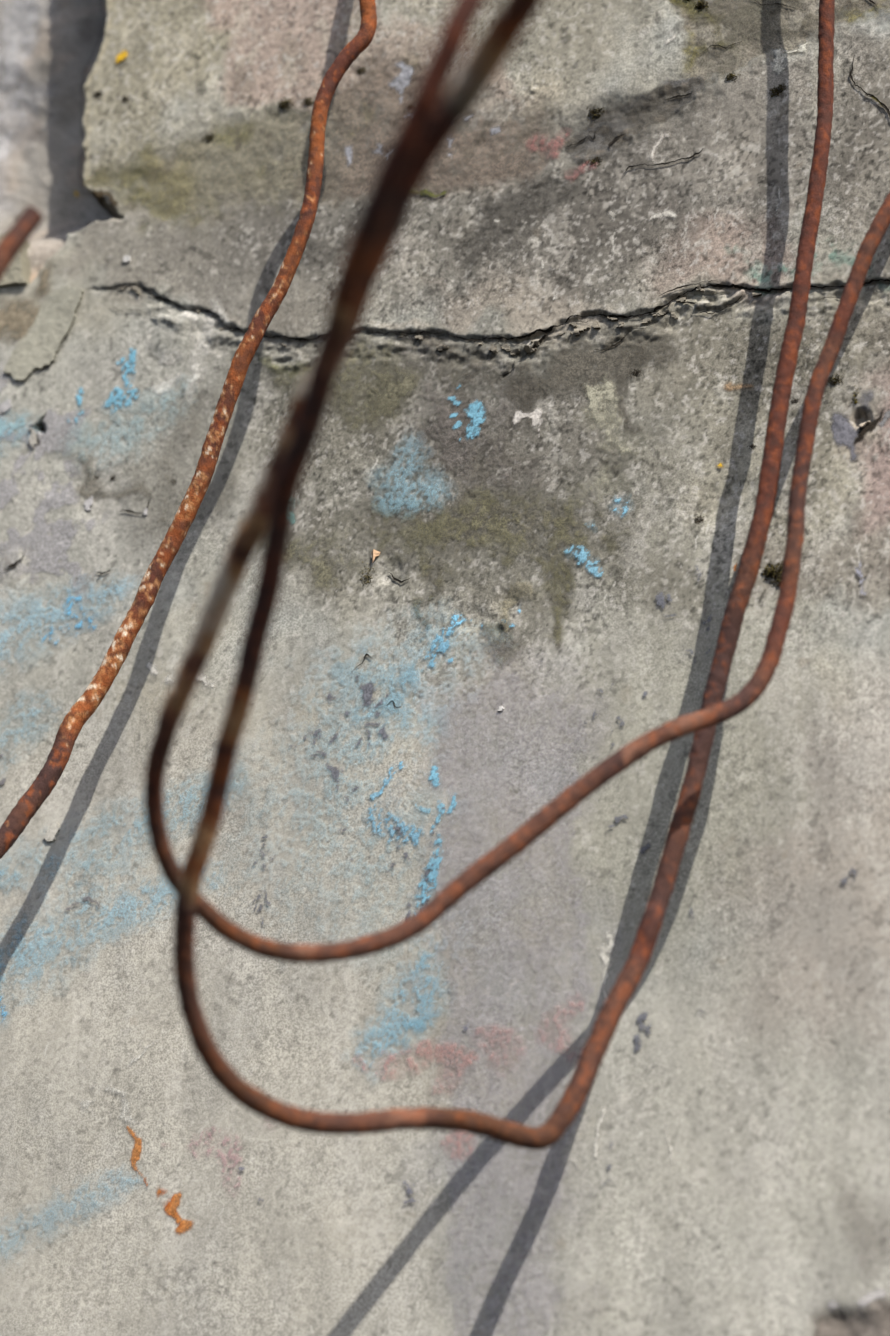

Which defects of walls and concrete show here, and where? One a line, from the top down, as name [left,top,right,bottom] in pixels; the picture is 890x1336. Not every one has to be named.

crack [98,285,321,347]
crack [357,279,890,376]
damp [332,321,675,493]
peeling [830,392,890,460]
spalling [0,0,716,1150]
damp [536,550,574,648]
rust [127,1126,192,1233]